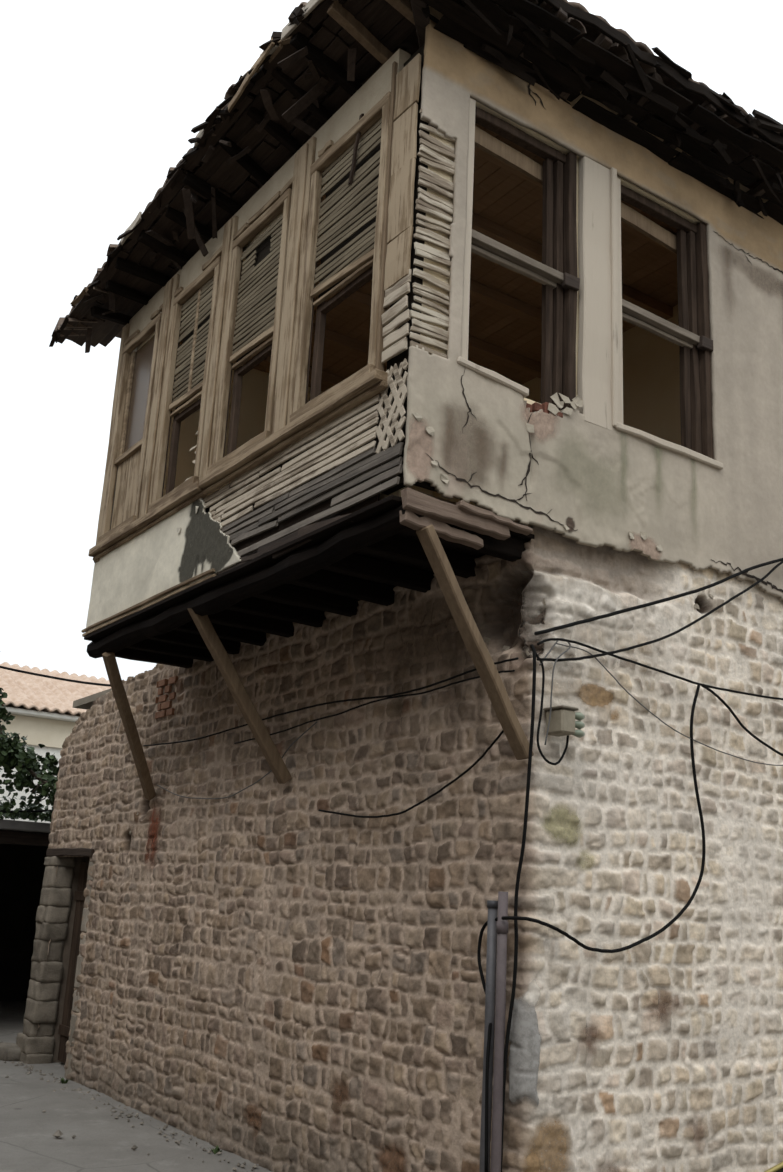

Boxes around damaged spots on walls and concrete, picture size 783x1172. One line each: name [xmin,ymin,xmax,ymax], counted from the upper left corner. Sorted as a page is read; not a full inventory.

crack [461,370,477,431]
peeling [548,393,583,415]
flaking render [406,412,449,484]
crack [427,413,578,531]
flaking render [177,500,233,583]
flaking render [629,531,663,560]